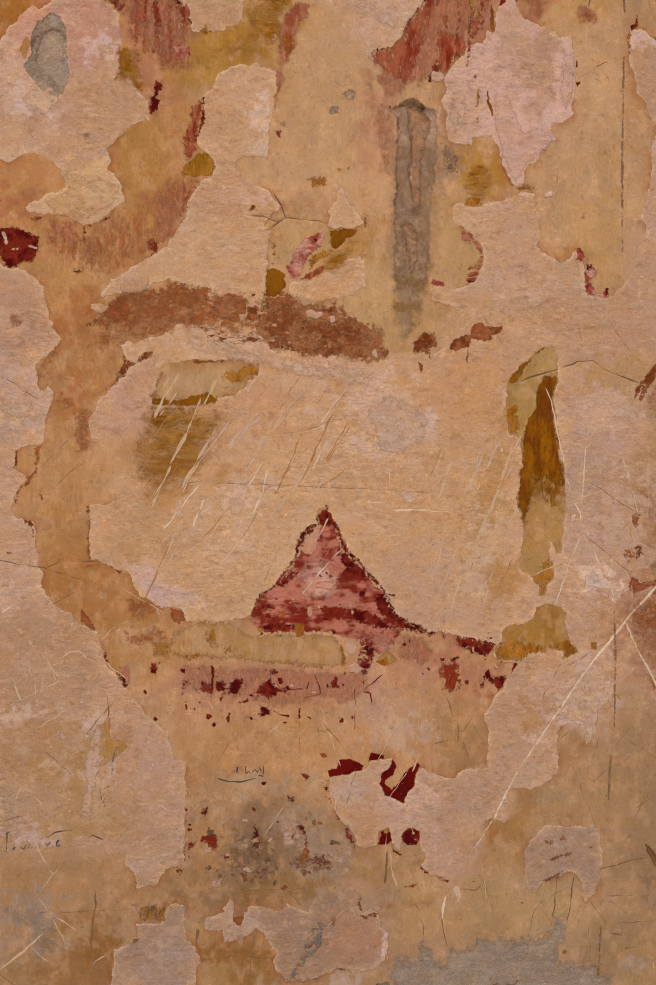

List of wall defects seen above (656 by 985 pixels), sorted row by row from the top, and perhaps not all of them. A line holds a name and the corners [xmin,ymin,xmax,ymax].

spalling [0,0,69,114]
crack [251,194,321,230]
peeling [151,359,259,406]
peeling [503,346,576,596]
crack [0,560,91,579]
peeling [267,506,378,591]
peeling [317,605,401,632]
peeling [80,704,127,827]